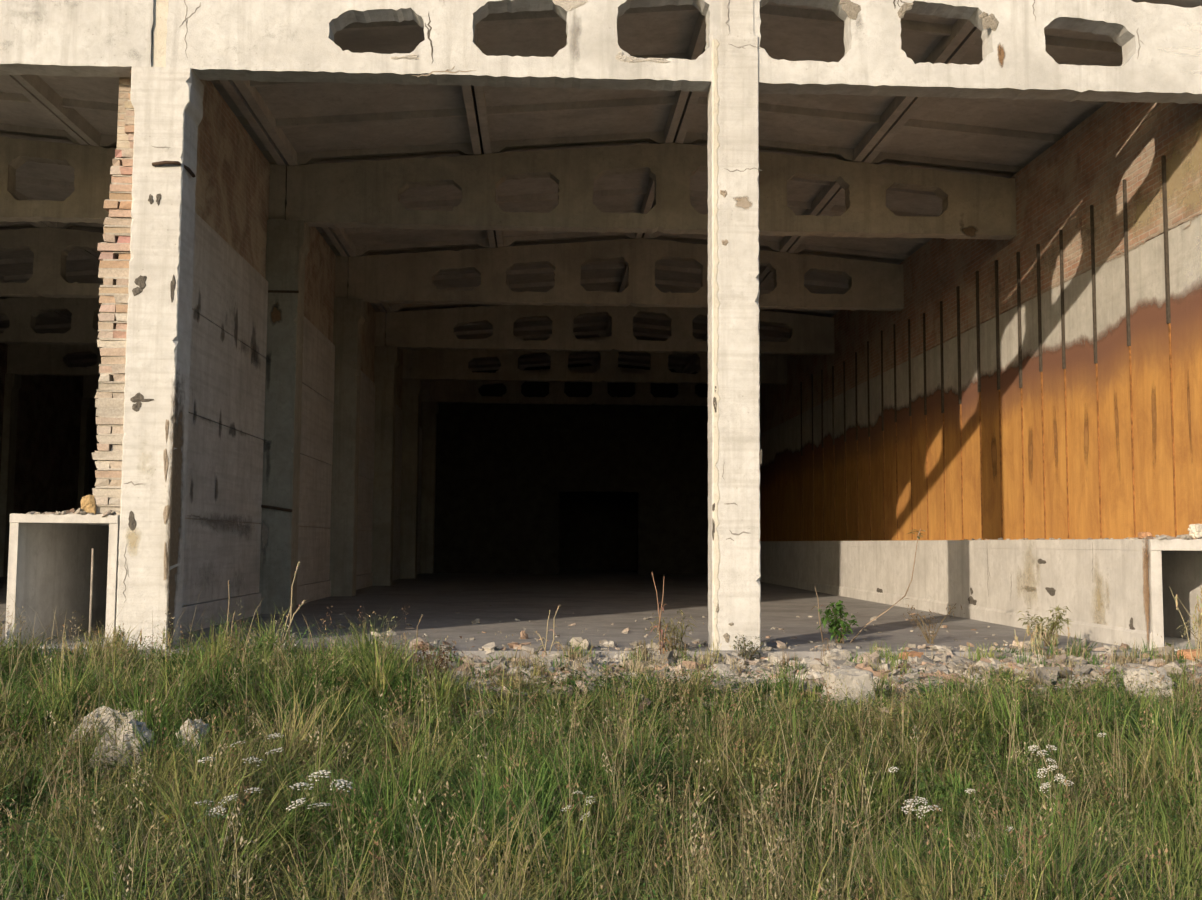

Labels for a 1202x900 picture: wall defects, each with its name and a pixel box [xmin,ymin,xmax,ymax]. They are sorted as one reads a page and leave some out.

spalling [552,0,588,11]
spalling [839,0,861,20]
spalling [897,2,914,18]
crack [180,0,200,58]
crack [413,0,476,77]
spalling [979,11,999,31]
spalling [615,51,670,63]
spalling [132,275,147,296]
leakage [221,315,270,382]
spalling [130,393,154,412]
leakage [167,400,196,649]